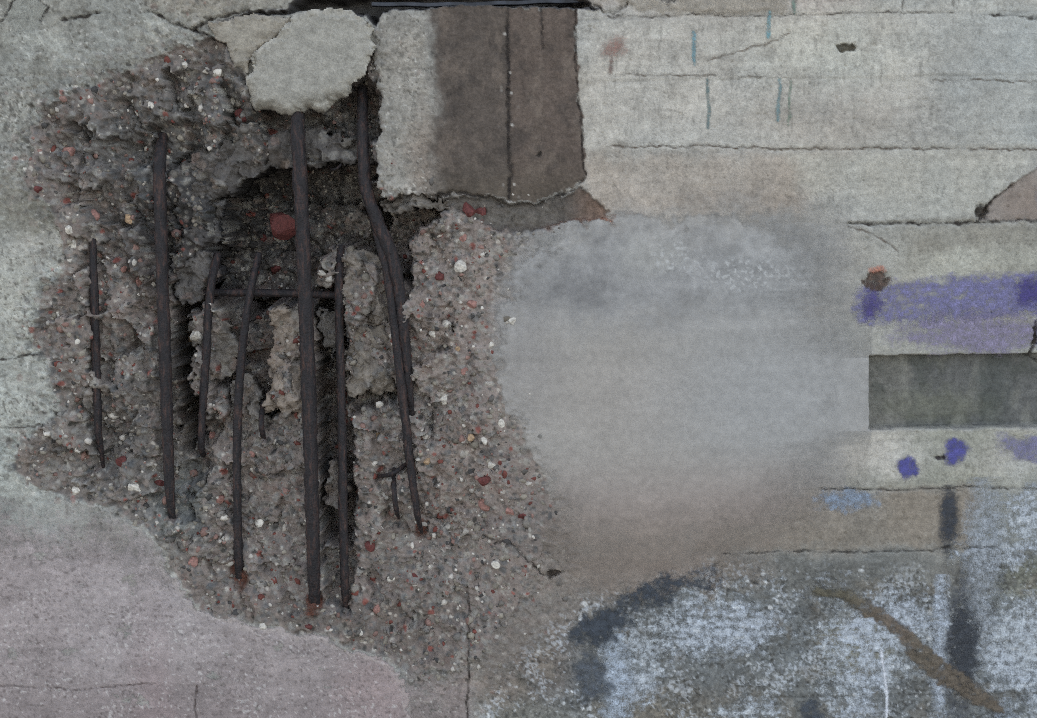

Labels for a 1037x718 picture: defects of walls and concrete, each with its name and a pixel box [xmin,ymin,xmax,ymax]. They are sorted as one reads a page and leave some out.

crack [42,8,98,21]
rust [89,238,105,468]
rust [197,252,221,458]
rust [229,252,263,590]
rust [290,111,323,616]
spalling [13,13,609,686]
rust [356,85,428,536]
crack [851,185,1037,251]
crack [1027,322,1037,361]
damp [569,568,796,718]
rust [812,587,1004,713]
damp [800,477,1037,718]